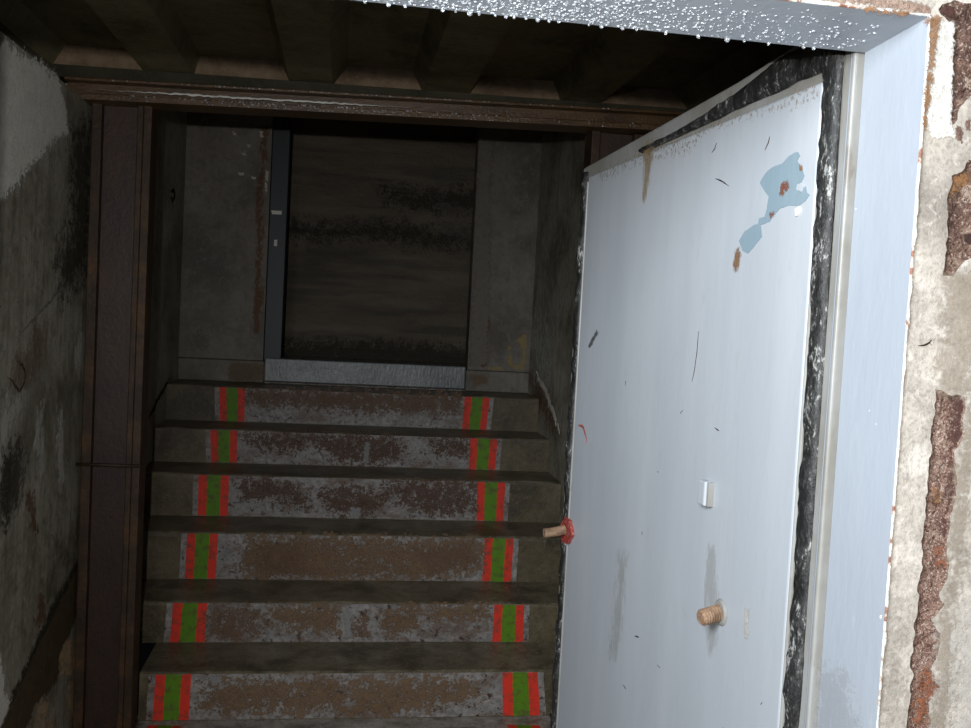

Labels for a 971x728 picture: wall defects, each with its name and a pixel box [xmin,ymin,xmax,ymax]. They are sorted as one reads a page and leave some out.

spalling [819,0,971,144]
rust [642,141,653,199]
peeling [733,152,809,272]
spalling [943,160,971,276]
spalling [906,389,966,728]